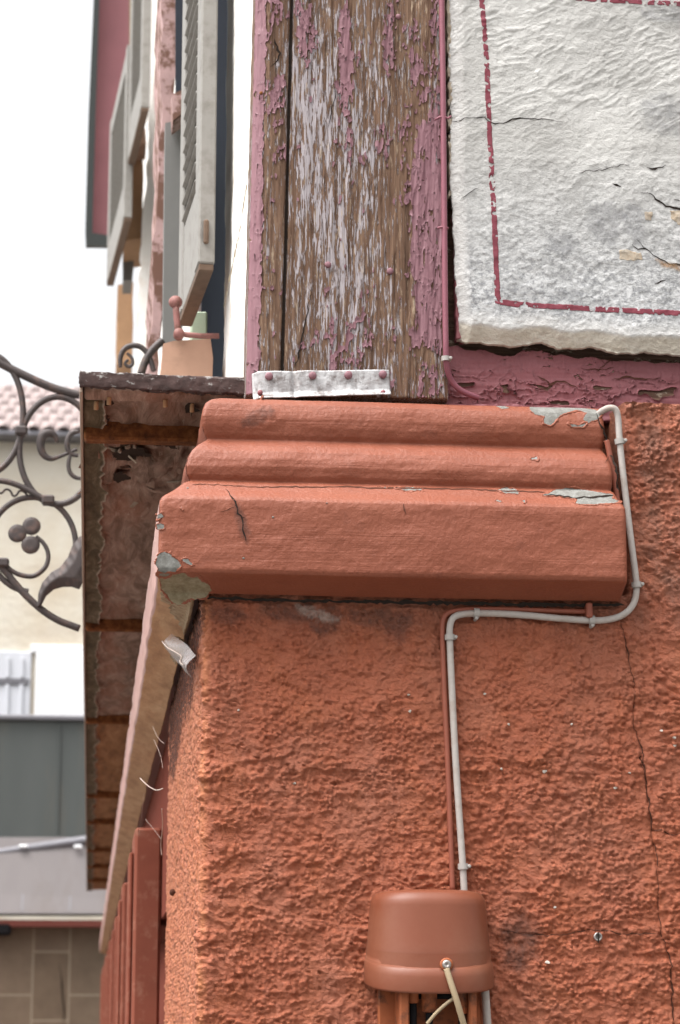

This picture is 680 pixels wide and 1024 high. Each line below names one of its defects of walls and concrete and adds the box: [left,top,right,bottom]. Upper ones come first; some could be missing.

crack [454,115,554,124]
peeling [246,0,319,395]
peeling [293,0,680,429]
crack [581,164,680,210]
crack [635,244,680,284]
crack [194,413,620,539]
peeling [493,486,527,504]
peeling [541,486,623,506]
peeling [154,550,212,641]
crack [207,596,680,890]
crack [502,915,674,1021]